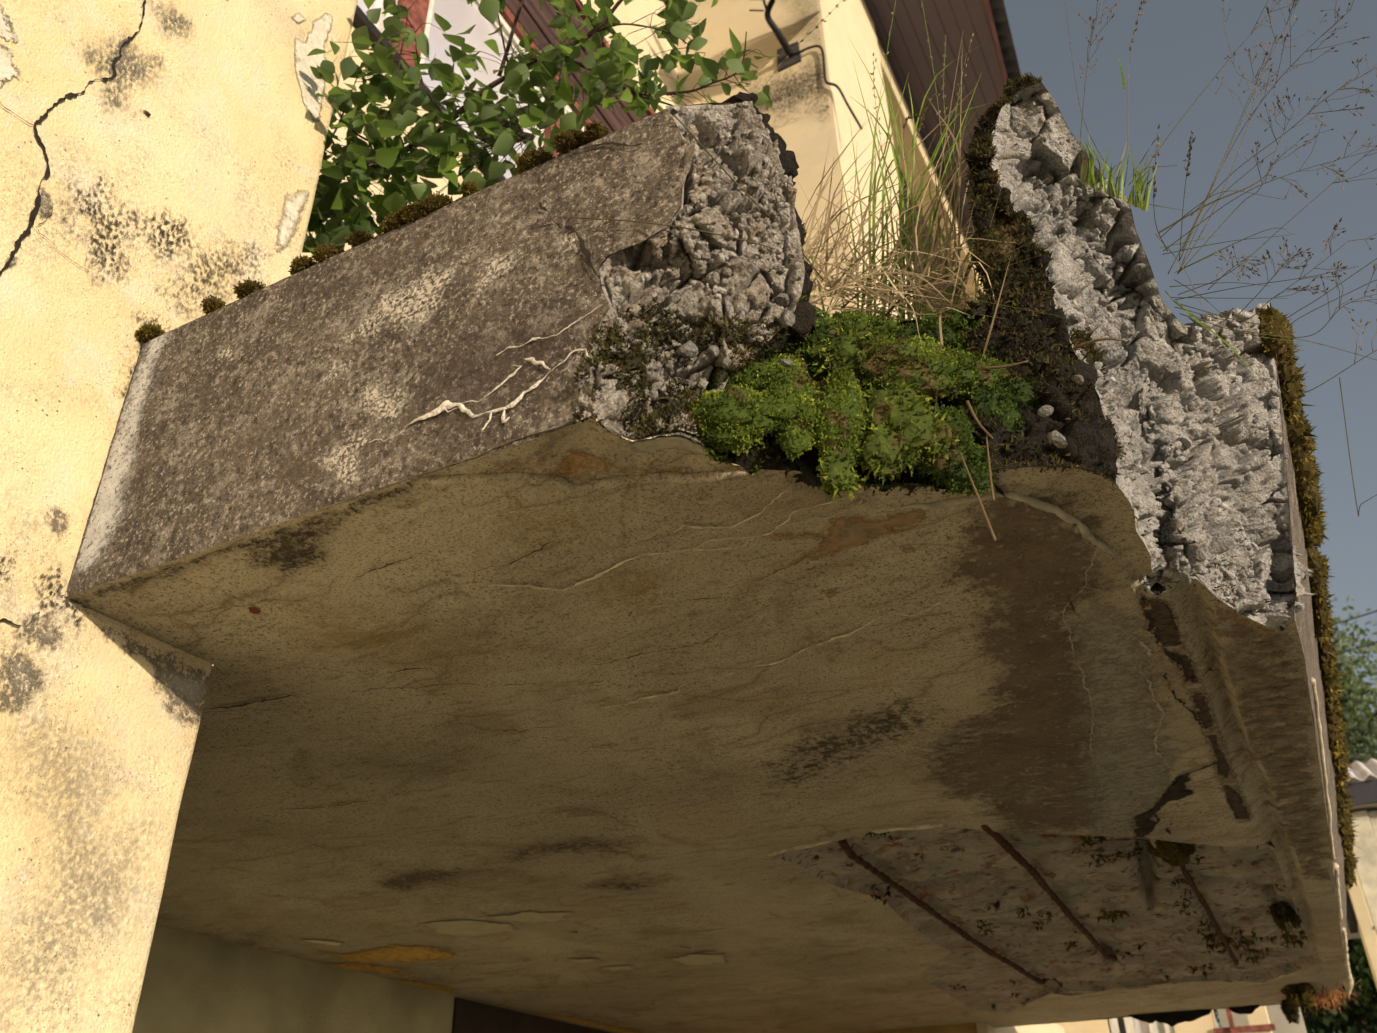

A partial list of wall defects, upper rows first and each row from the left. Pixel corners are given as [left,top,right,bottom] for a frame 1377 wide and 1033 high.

peeling [0,4,22,88]
peeling [37,186,53,219]
crack [0,0,146,275]
leakage [62,174,262,313]
leakage [34,314,417,626]
peeling [276,189,310,252]
peeling [292,13,333,121]
leakage [317,253,603,487]
spalling [575,101,805,438]
spalling [991,82,1317,823]
leakage [586,484,1176,836]
spalling [769,776,1314,1015]